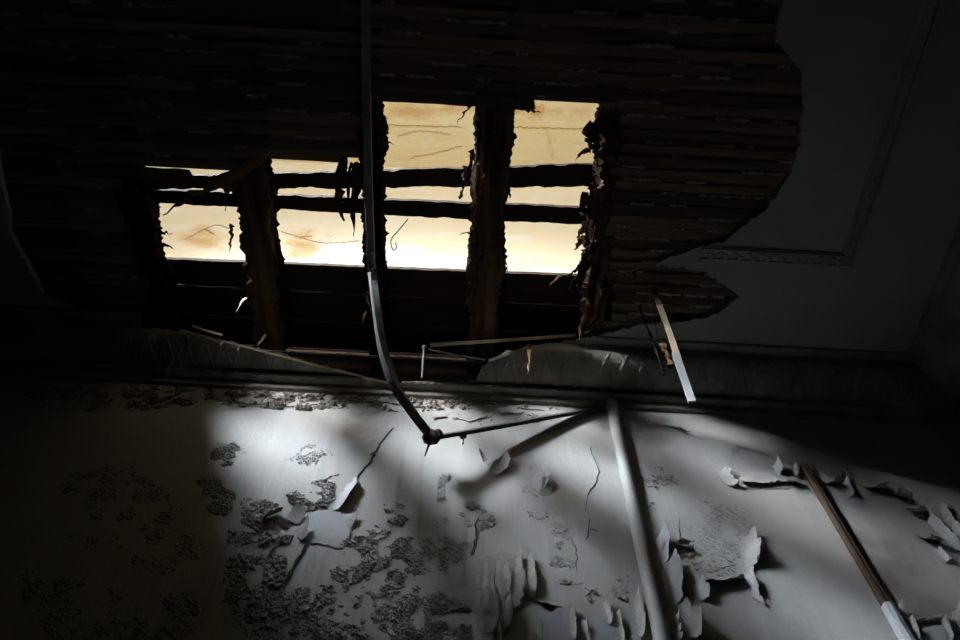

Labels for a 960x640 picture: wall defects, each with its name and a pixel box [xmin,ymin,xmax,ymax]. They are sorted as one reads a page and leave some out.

spalling [204,387,588,425]
peeling [210,441,246,467]
peeling [286,444,333,466]
crack [206,397,586,478]
peeling [479,445,511,475]
peeling [718,454,805,490]
crack [570,444,600,572]
peeling [822,471,960,563]
peeling [196,473,499,640]
peeling [527,510,646,640]
peeling [897,596,960,640]